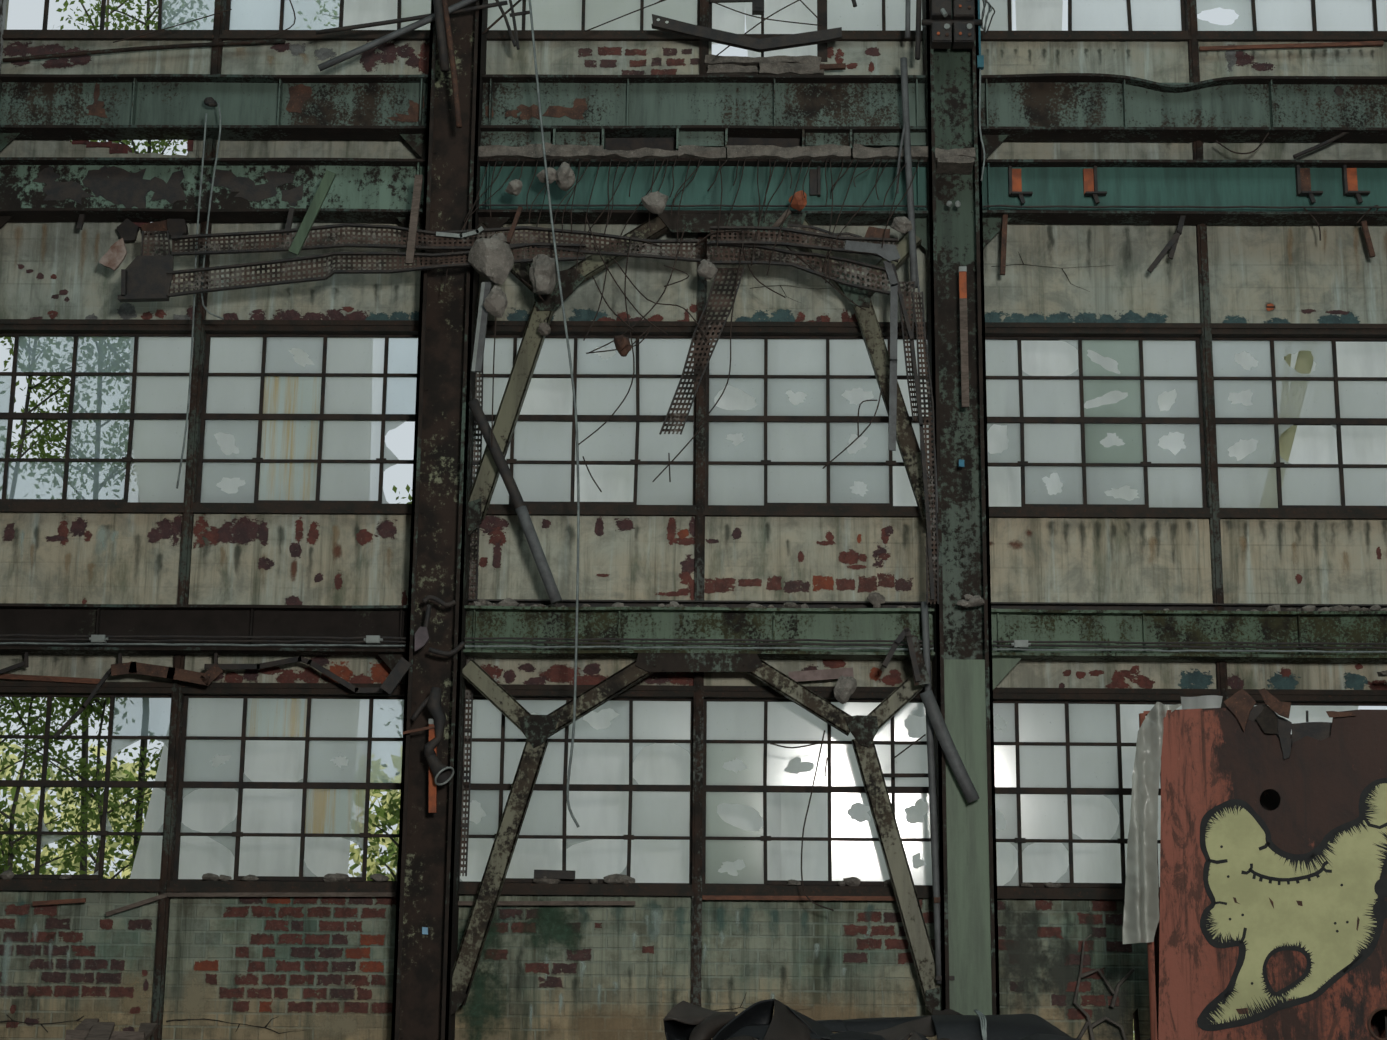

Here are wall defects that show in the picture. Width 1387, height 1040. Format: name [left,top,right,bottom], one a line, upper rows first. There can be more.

flaking render [578,46,699,75]
peeling [827,46,881,73]
peeling [2,523,15,541]
peeling [45,516,93,547]
peeling [147,513,275,570]
peeling [289,516,320,558]
peeling [355,518,398,546]
peeling [479,515,509,568]
peeling [594,516,635,536]
flaking render [655,516,914,600]
peeling [314,570,343,589]
damp [790,1004,862,1021]